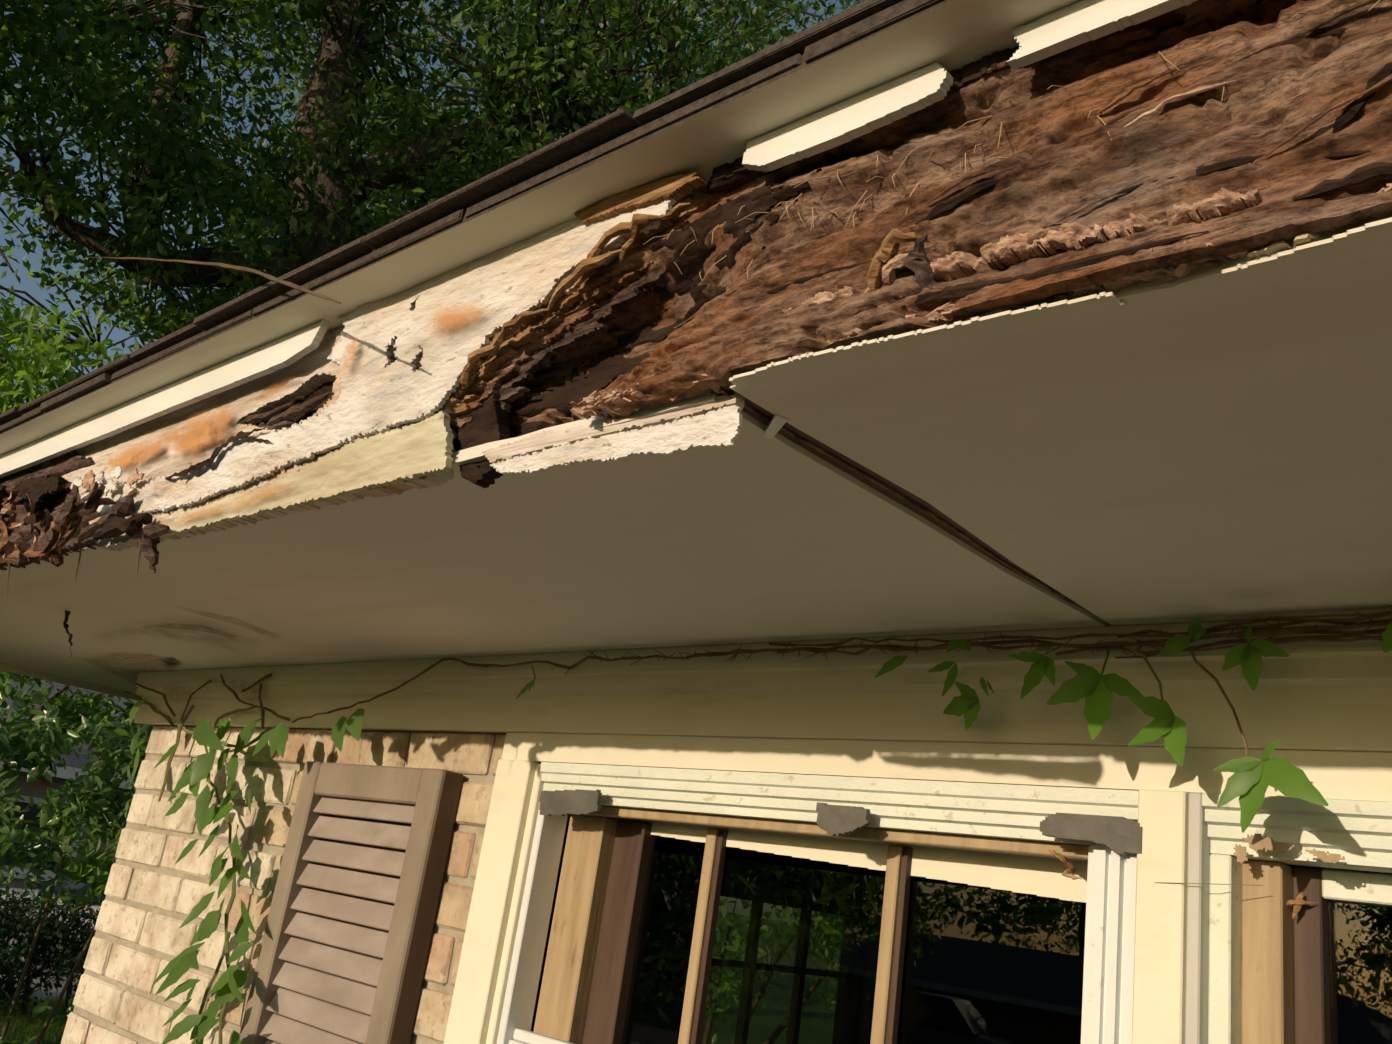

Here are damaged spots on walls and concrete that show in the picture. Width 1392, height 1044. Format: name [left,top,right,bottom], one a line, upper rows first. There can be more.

peeling [1222,217,1392,289]
peeling [0,171,715,563]
peeling [482,292,1127,474]
crack [711,386,1098,617]
spalling [1233,833,1345,864]